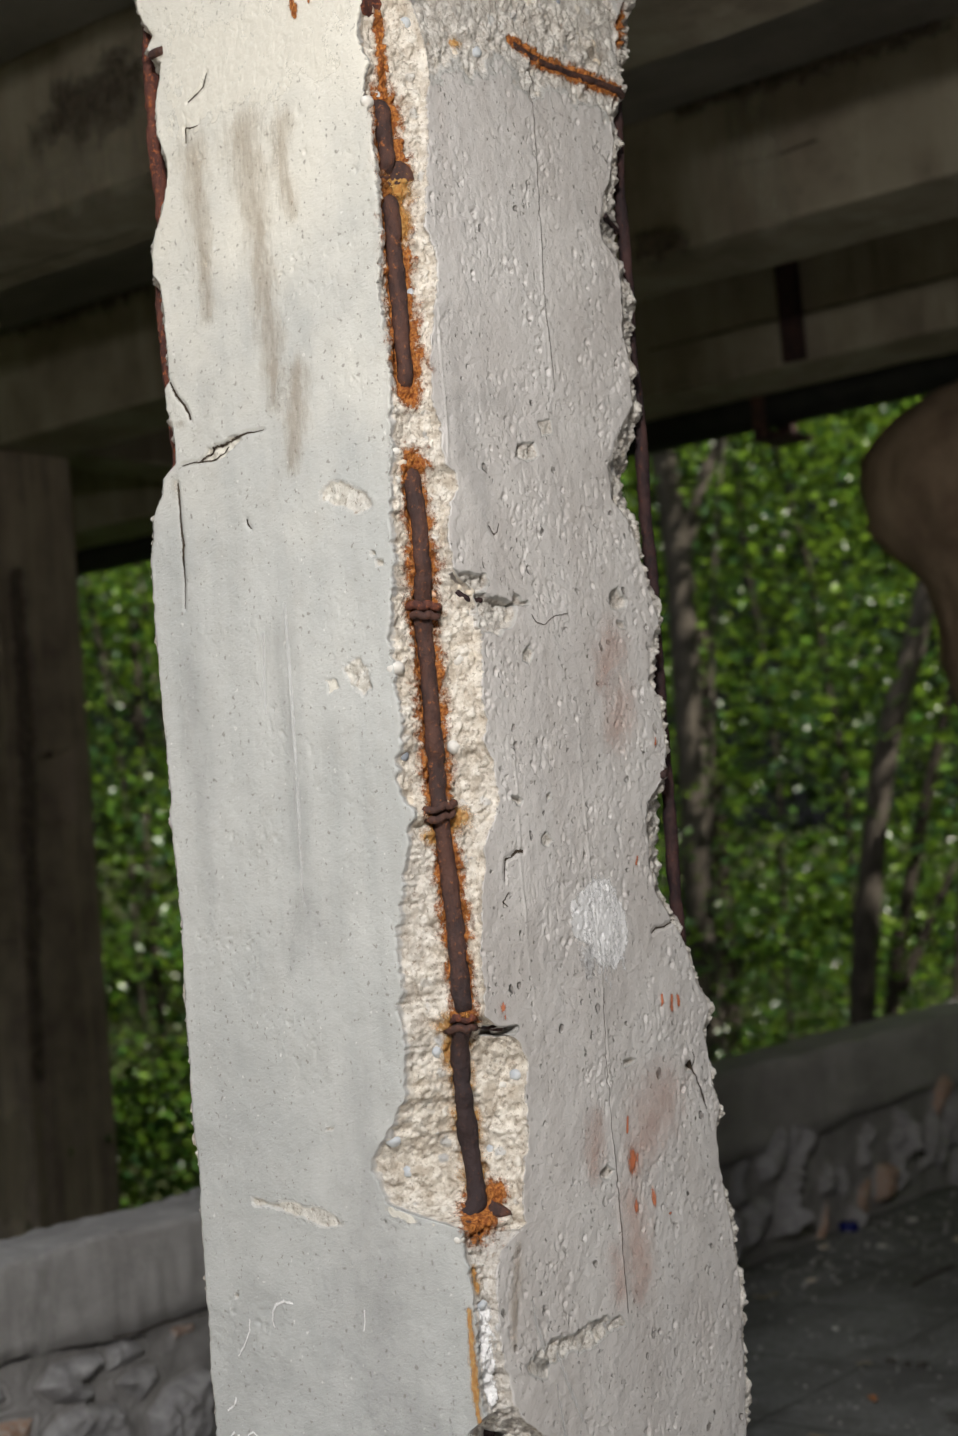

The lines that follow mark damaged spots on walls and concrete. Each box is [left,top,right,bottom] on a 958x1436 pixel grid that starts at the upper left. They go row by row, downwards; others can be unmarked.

rust [506,33,622,101]
rust [360,0,433,412]
crack [170,382,191,421]
crack [177,429,264,608]
spalling [134,0,726,1436]
rust [399,441,482,1131]
rust [455,1160,512,1247]
rust [467,1308,482,1424]
spalling [724,1188,752,1432]